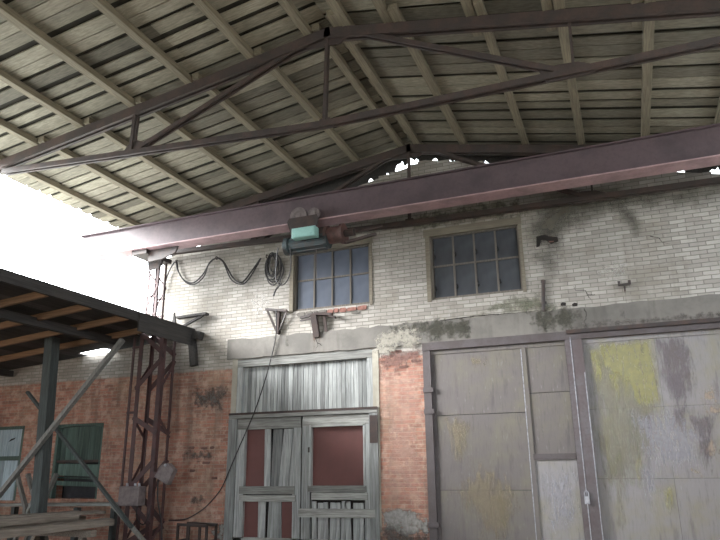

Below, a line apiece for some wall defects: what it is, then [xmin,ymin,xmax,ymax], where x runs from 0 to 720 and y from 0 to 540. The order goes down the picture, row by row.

water stain [534,191,695,241]
spalling [297,305,367,320]
water stain [492,299,577,332]
water stain [408,319,470,341]
water stain [194,387,228,409]